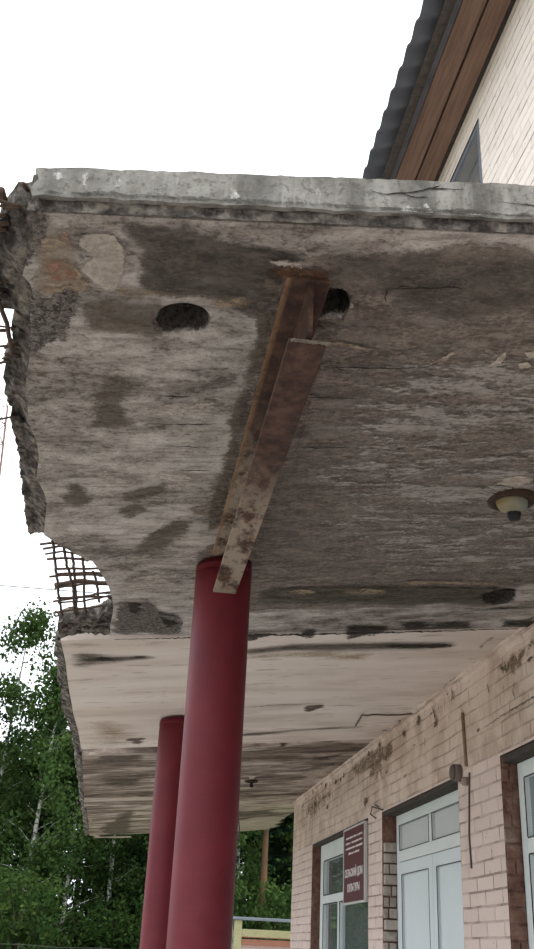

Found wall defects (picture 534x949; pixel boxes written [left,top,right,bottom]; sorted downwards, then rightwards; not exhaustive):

spalling [72,191,534,217]
crack [373,185,462,198]
rust [207,260,327,531]
damp [81,222,534,622]
damp [47,478,89,507]
peeling [498,476,533,486]
spalling [0,181,191,838]
peeling [248,621,534,641]
damp [247,643,451,659]
damp [501,641,533,673]
damp [352,742,391,778]
peeling [238,817,285,832]